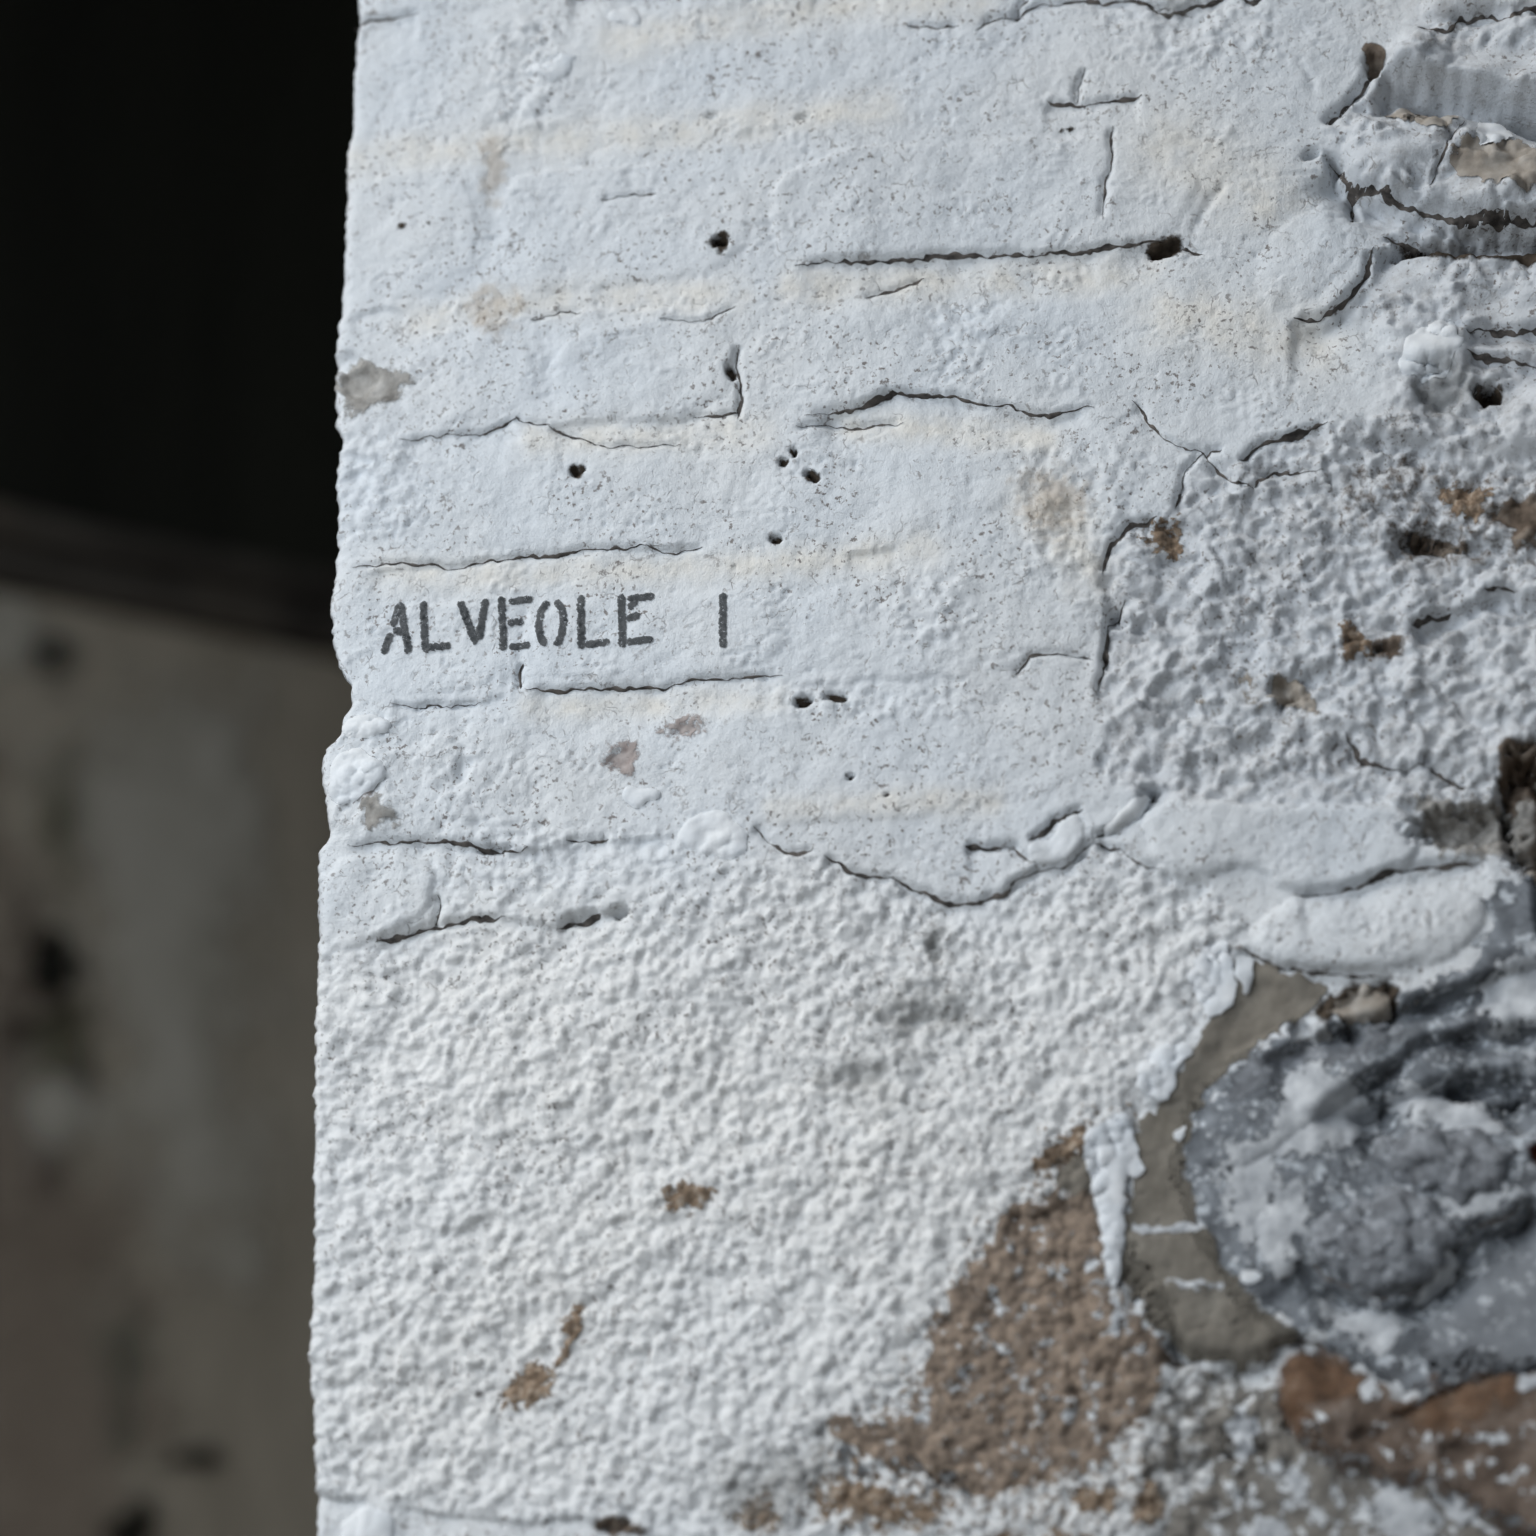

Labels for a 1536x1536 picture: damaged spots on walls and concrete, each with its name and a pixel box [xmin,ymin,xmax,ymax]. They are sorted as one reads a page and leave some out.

crack [1013,400,1327,693]
spalling [1340,457,1536,565]
spalling [725,737,1536,1536]